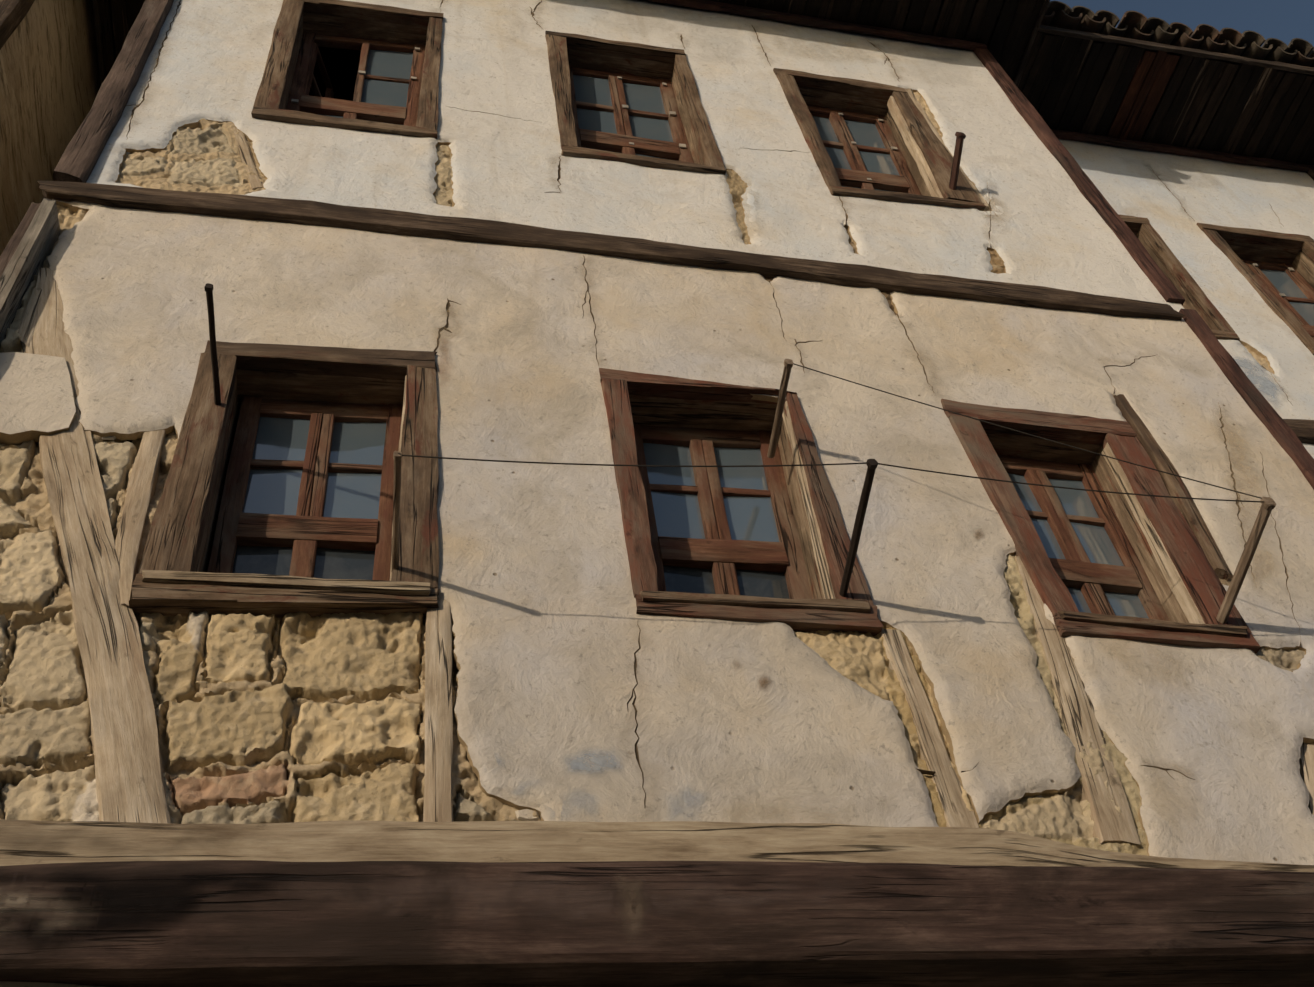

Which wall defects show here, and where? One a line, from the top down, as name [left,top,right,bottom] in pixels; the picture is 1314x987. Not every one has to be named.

crack [126,0,181,138]
spalling [117,119,267,195]
spalling [434,144,453,207]
spalling [726,170,750,244]
crack [582,257,599,365]
spalling [91,433,142,540]
spalling [136,429,178,574]
spalling [0,439,99,822]
spalling [135,611,426,824]
spalling [451,621,541,822]
crack [627,624,646,806]
spalling [794,554,1148,856]